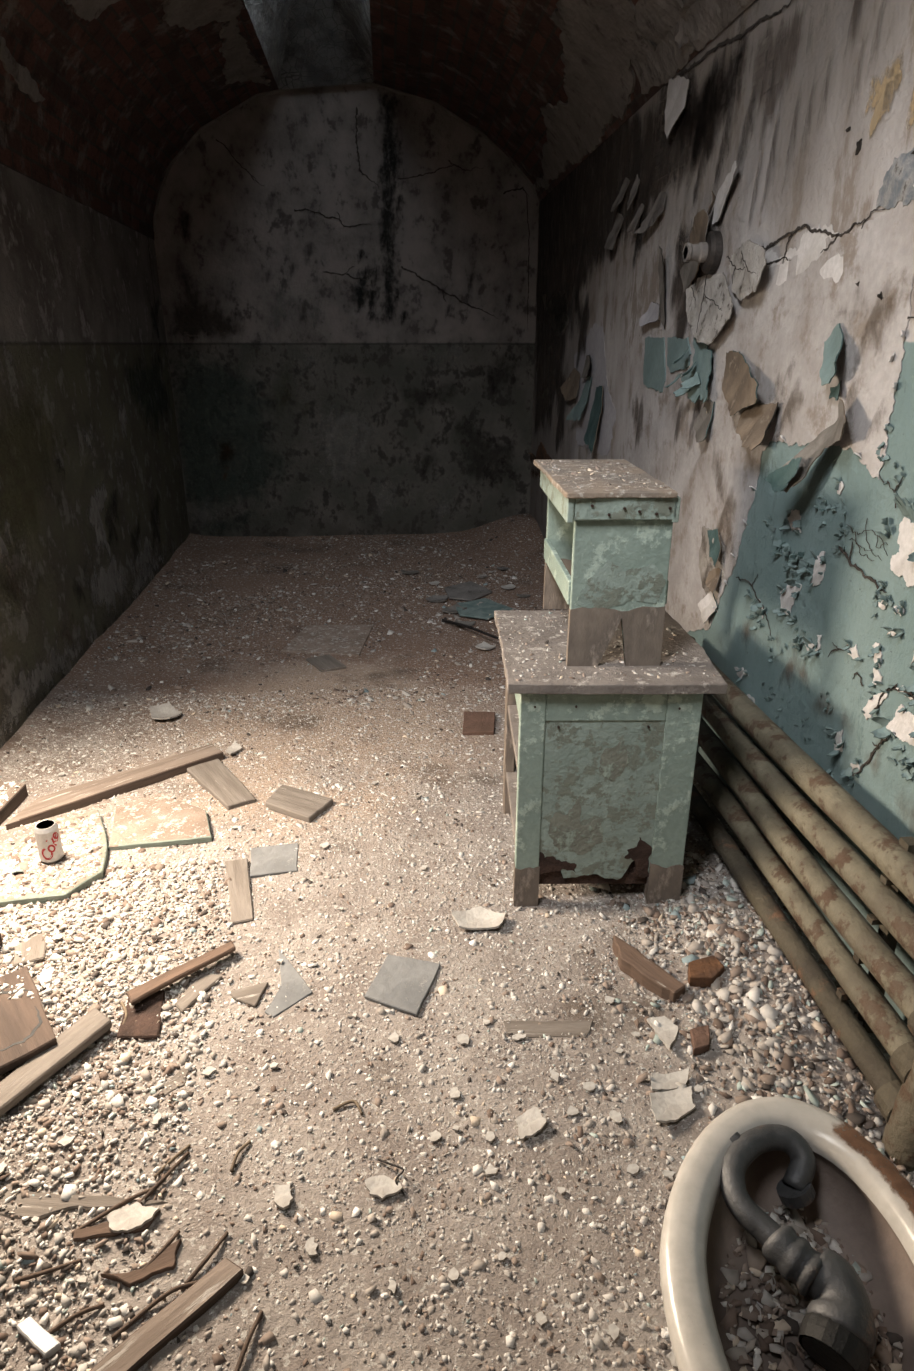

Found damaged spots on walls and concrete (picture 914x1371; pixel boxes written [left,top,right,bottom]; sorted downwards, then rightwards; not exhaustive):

spalling [0,35,45,103]
spalling [64,0,121,22]
spalling [162,0,271,86]
crack [355,107,480,187]
spalling [534,0,755,192]
crack [660,0,792,88]
spalling [845,57,914,155]
crack [294,208,372,228]
water stain [353,95,408,322]
crack [401,187,530,326]
crack [762,208,885,265]
peeling [560,148,914,788]